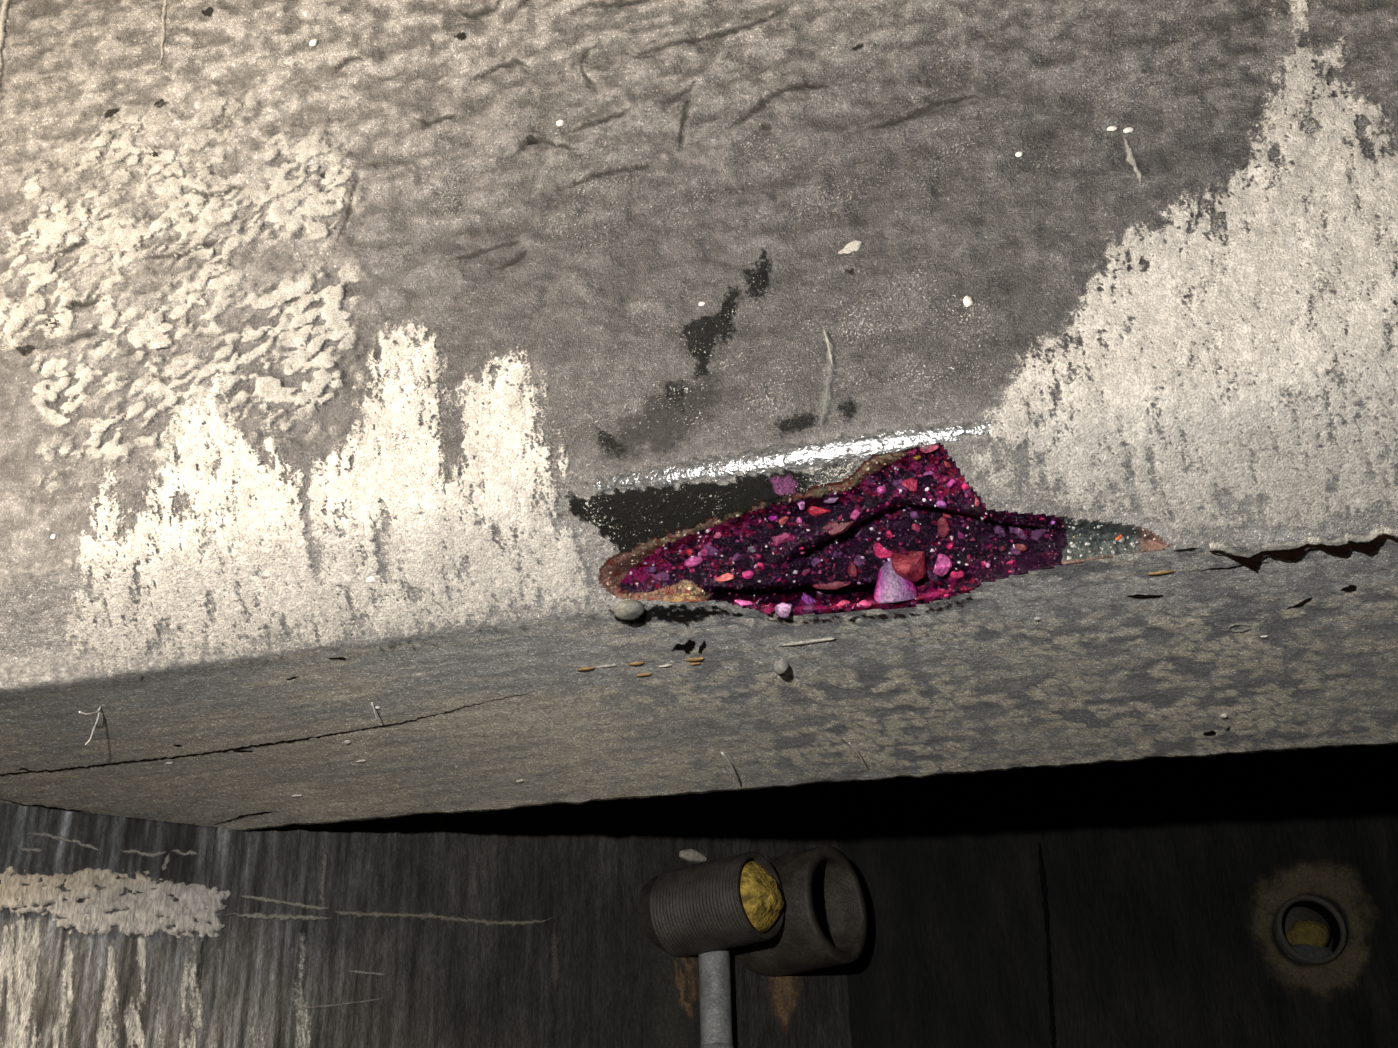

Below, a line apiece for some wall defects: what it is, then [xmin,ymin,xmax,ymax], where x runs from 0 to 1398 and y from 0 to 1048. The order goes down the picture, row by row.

water stain [0,0,1398,699]
spalling [597,436,1171,618]
peeling [1209,526,1398,559]
crack [0,693,528,776]